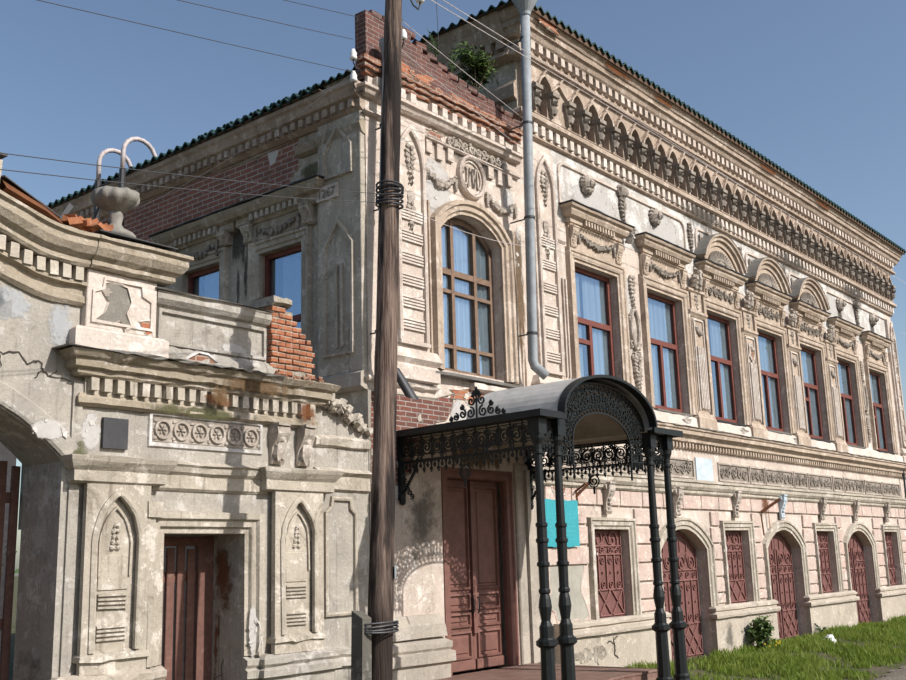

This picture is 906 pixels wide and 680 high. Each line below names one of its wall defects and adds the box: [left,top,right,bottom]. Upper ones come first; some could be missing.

crack [0,351,70,381]
peeling [32,419,68,440]
leakage [413,495,433,539]
corrosion [214,550,232,675]